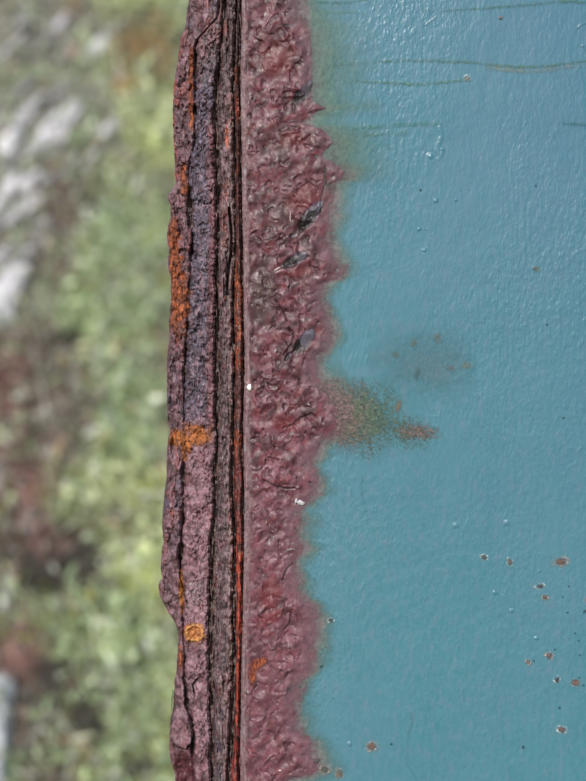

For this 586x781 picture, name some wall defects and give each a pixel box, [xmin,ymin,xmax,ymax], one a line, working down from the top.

rust [158,0,432,781]